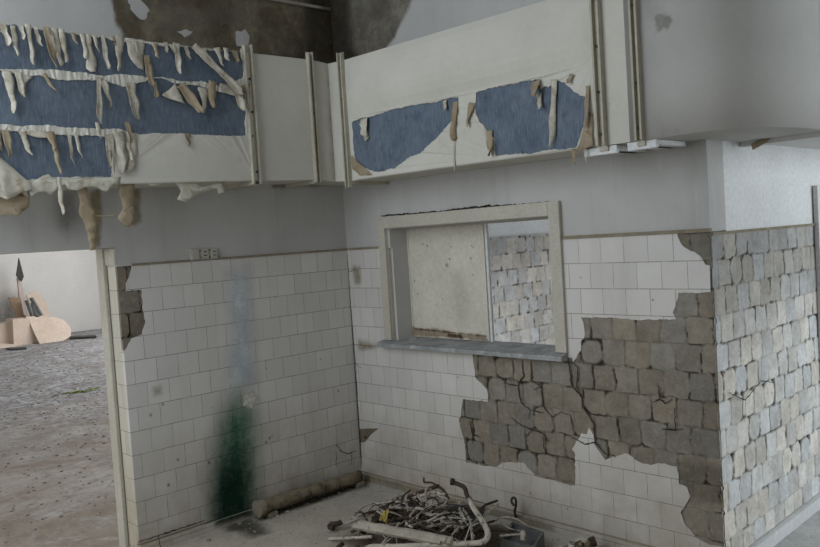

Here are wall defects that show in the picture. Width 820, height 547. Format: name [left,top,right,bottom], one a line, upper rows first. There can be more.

peeling [0,22,250,215]
peeling [351,74,593,176]
spalling [117,266,145,350]
crack [506,361,615,457]
spalling [460,226,820,547]
crack [654,385,681,431]
damp [219,467,266,535]
damp [276,485,366,513]